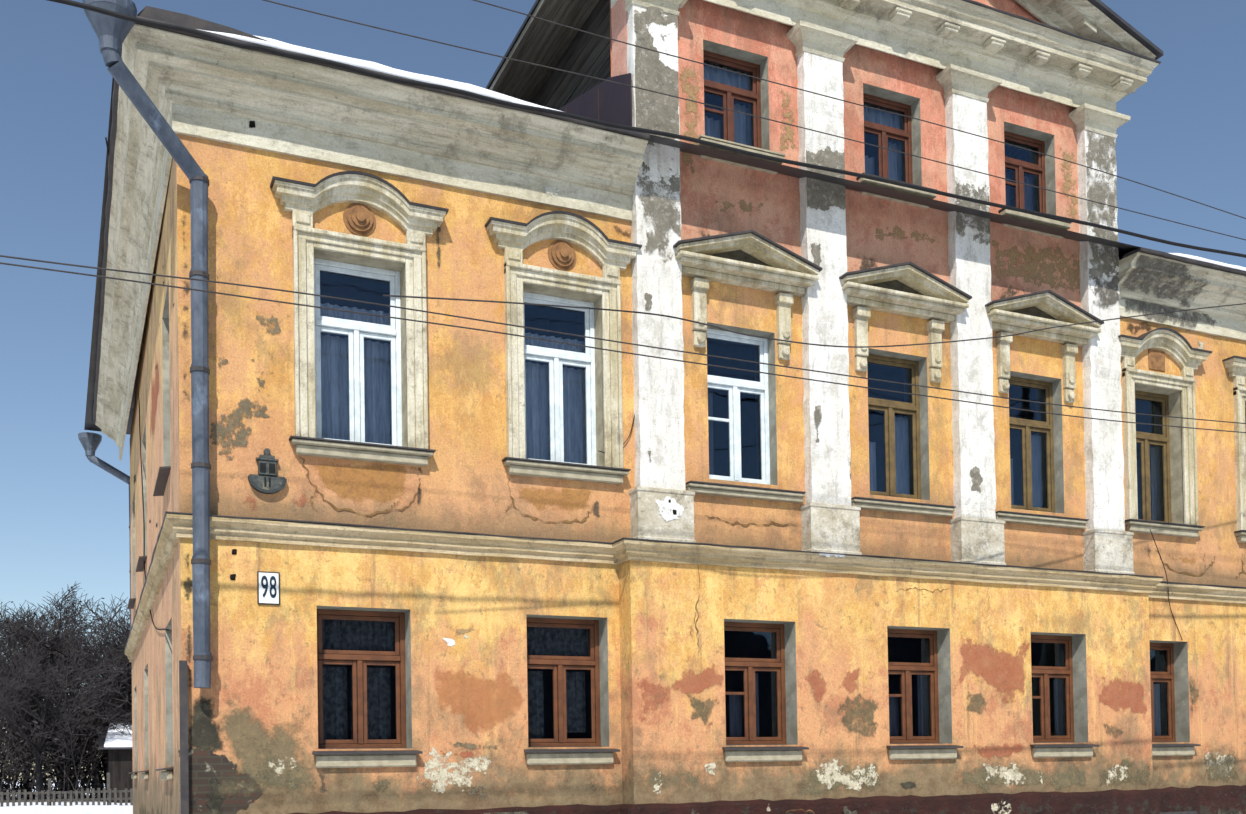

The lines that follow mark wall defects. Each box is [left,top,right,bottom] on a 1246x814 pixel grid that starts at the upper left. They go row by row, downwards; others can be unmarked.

peeling [634,6,702,262]
peeling [955,131,1216,349]
flaking render [210,352,273,460]
crack [300,457,421,517]
crack [506,479,593,523]
crack [706,515,797,527]
peeling [642,664,723,720]
peeling [959,639,1029,704]
spalling [178,747,263,814]
peeling [417,742,528,814]
peeling [816,758,879,792]
peeling [974,744,1043,787]